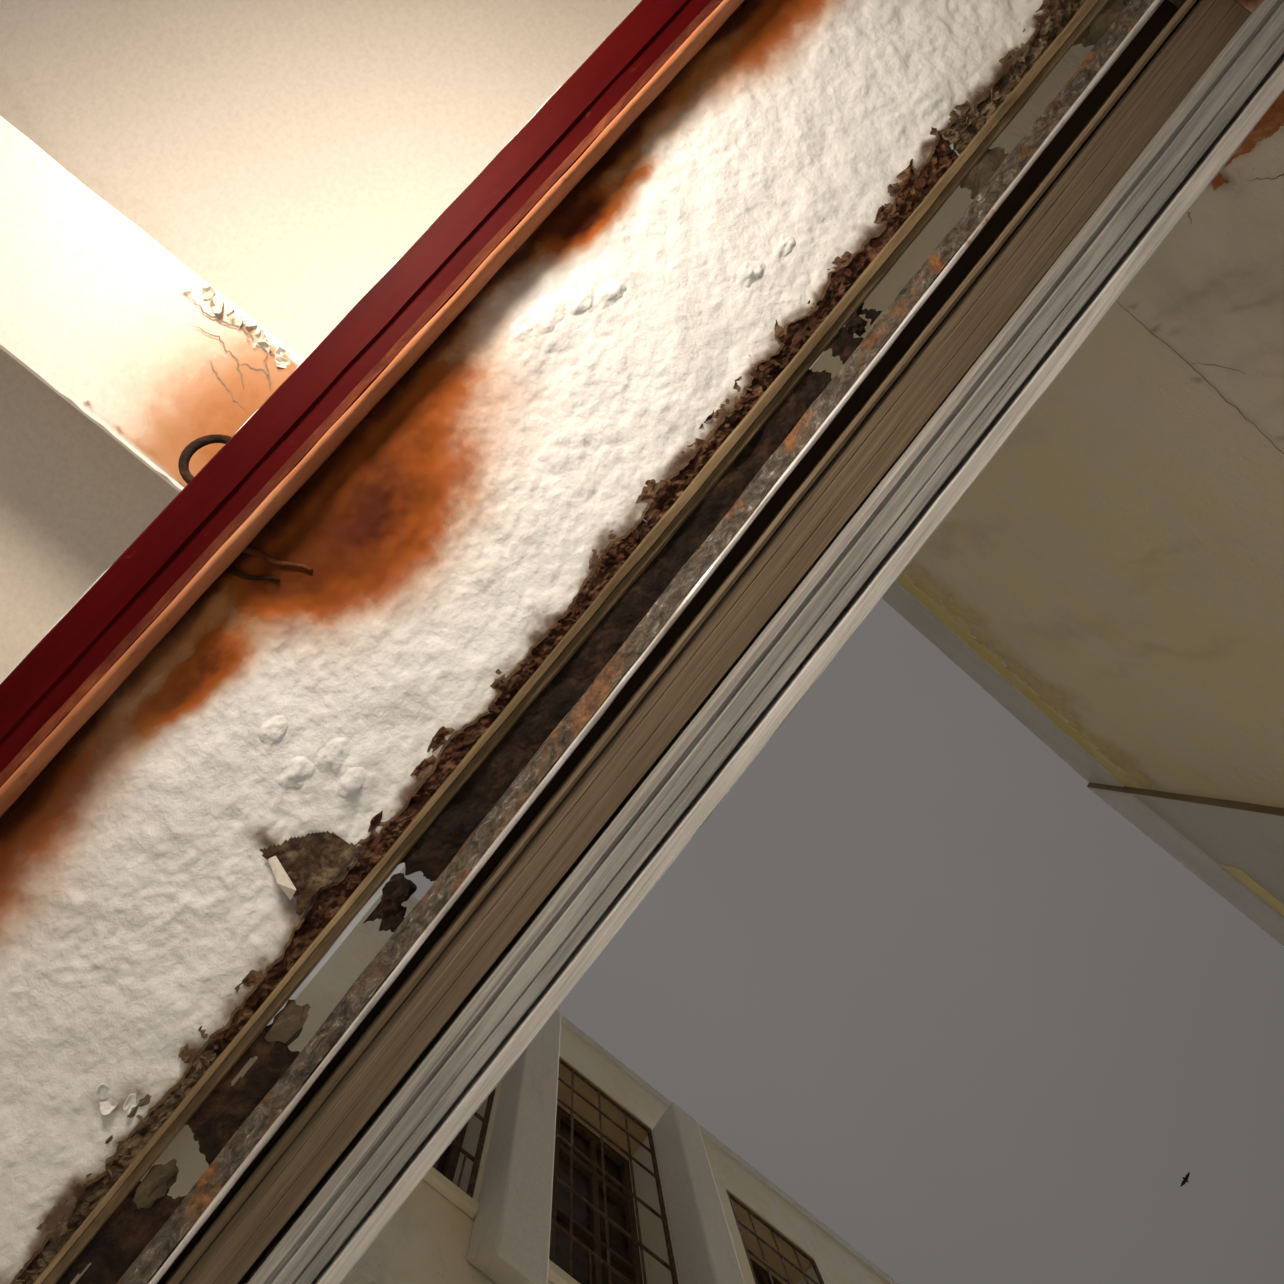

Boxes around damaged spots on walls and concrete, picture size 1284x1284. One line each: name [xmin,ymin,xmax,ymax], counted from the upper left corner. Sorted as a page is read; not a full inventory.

corrosion [1072,0,1131,47]
flaking render [1211,90,1284,191]
spalling [183,282,293,368]
crack [187,296,292,409]
spalling [636,0,1086,528]
crack [1117,301,1284,454]
corrosion [0,0,882,932]
spalling [0,511,653,1284]